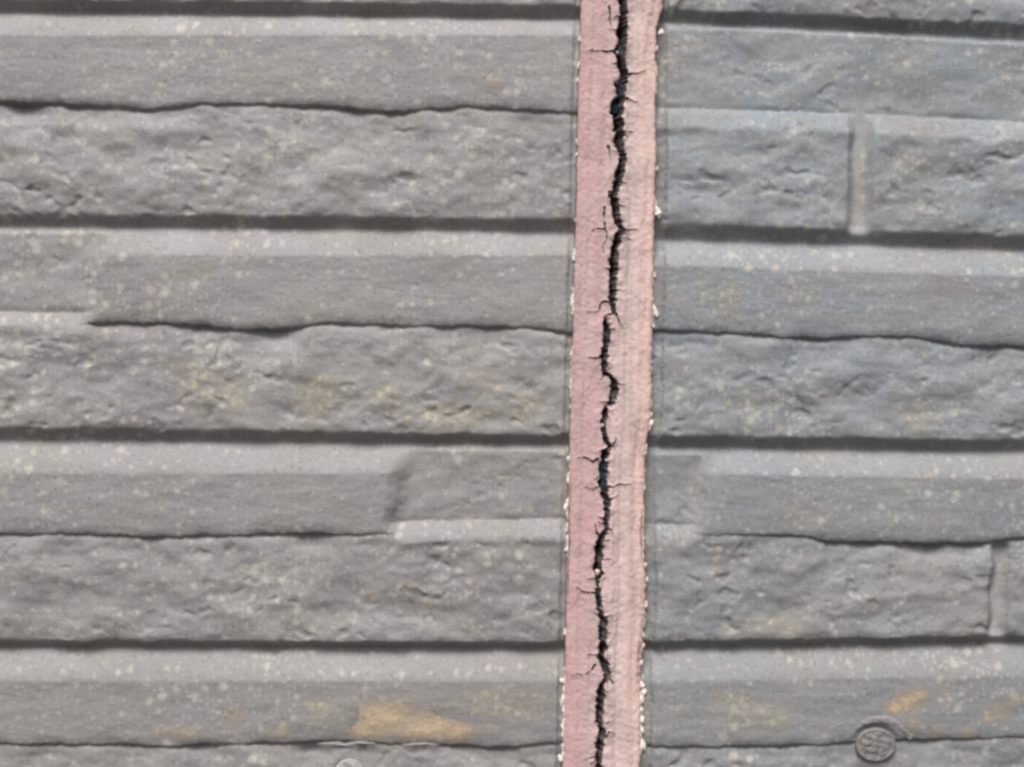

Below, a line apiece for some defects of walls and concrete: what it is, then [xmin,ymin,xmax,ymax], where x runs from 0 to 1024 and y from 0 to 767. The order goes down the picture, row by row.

crack [567,0,644,767]